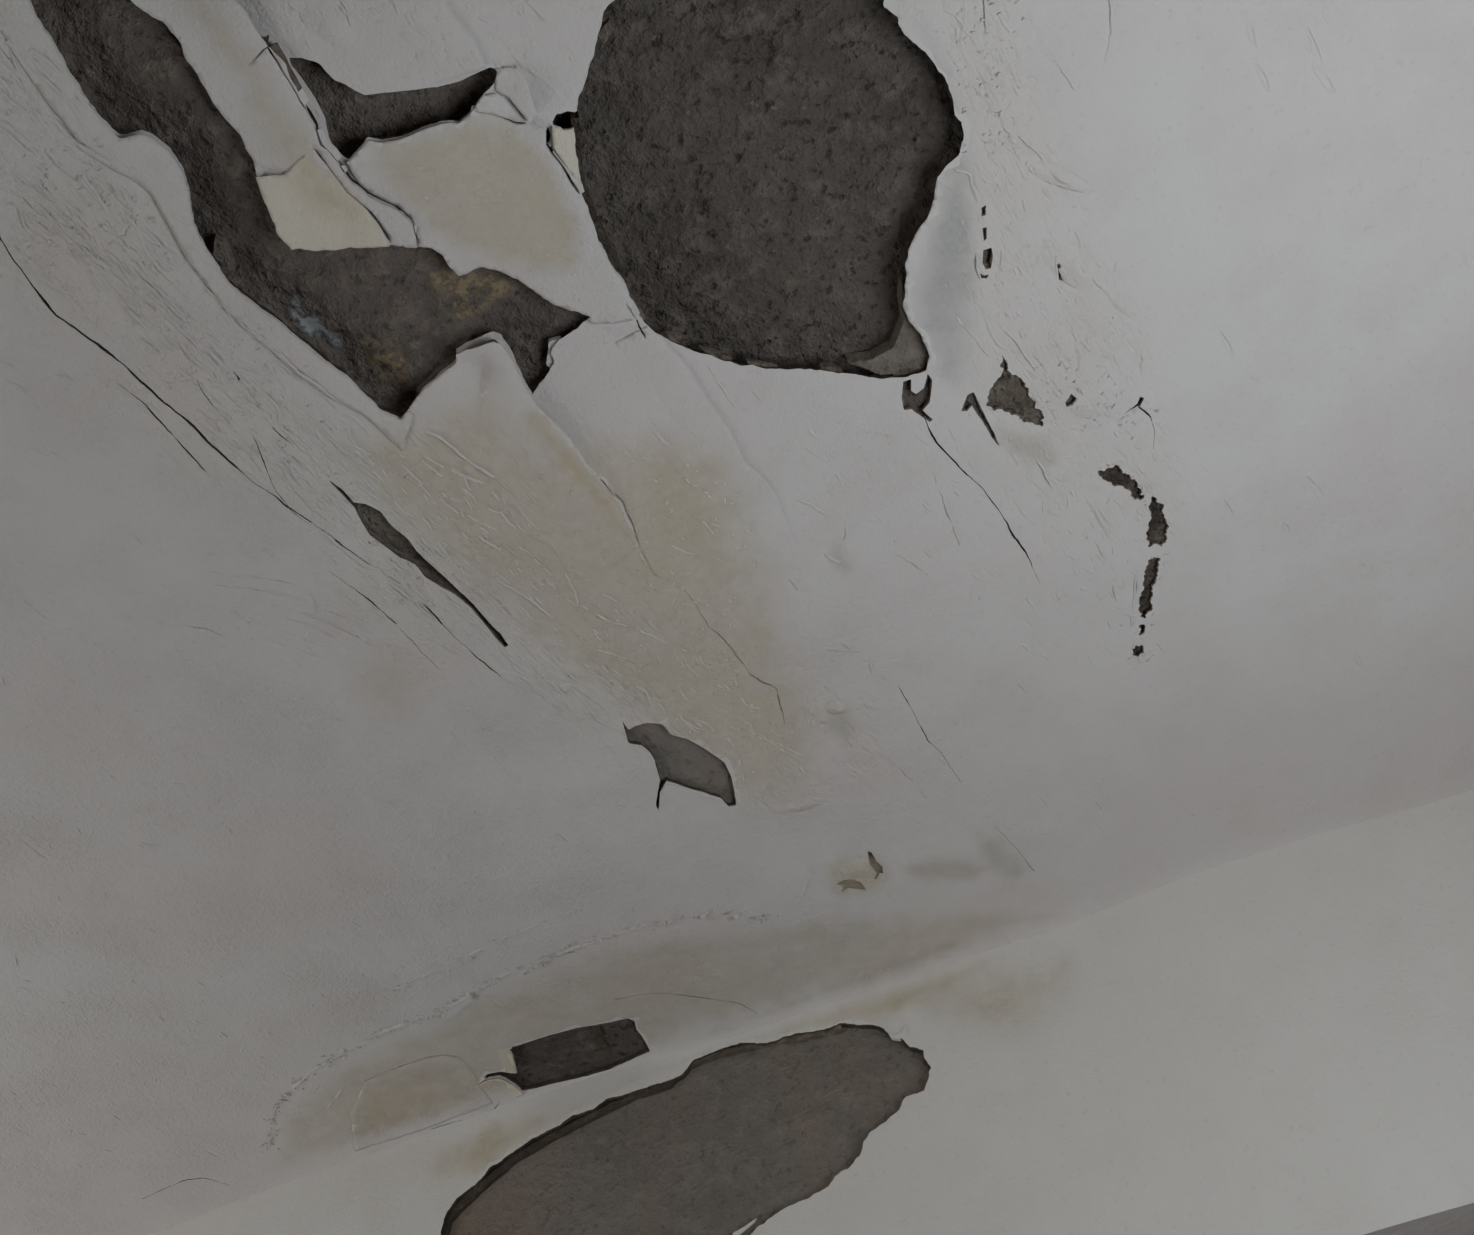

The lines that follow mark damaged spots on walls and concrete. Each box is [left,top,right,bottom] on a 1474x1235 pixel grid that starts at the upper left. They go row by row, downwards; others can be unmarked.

spalling [0,0,1159,569]
crack [0,237,501,677]
spalling [330,481,508,647]
spalling [623,723,736,813]
peeling [350,1018,650,1152]
spalling [441,1023,931,1235]